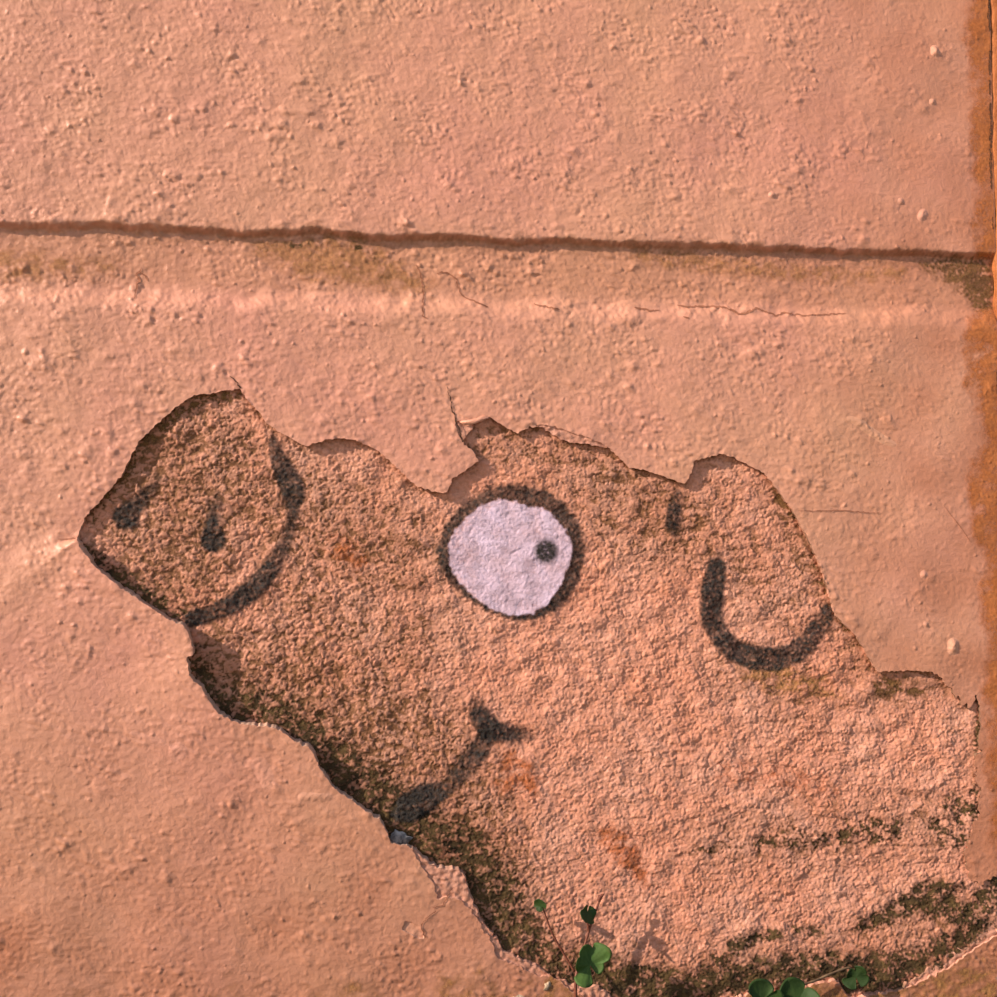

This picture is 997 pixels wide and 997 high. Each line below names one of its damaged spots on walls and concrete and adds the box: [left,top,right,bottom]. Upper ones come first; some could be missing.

leakage [921,258,993,311]
crack [634,305,845,319]
peeling [77,389,997,997]